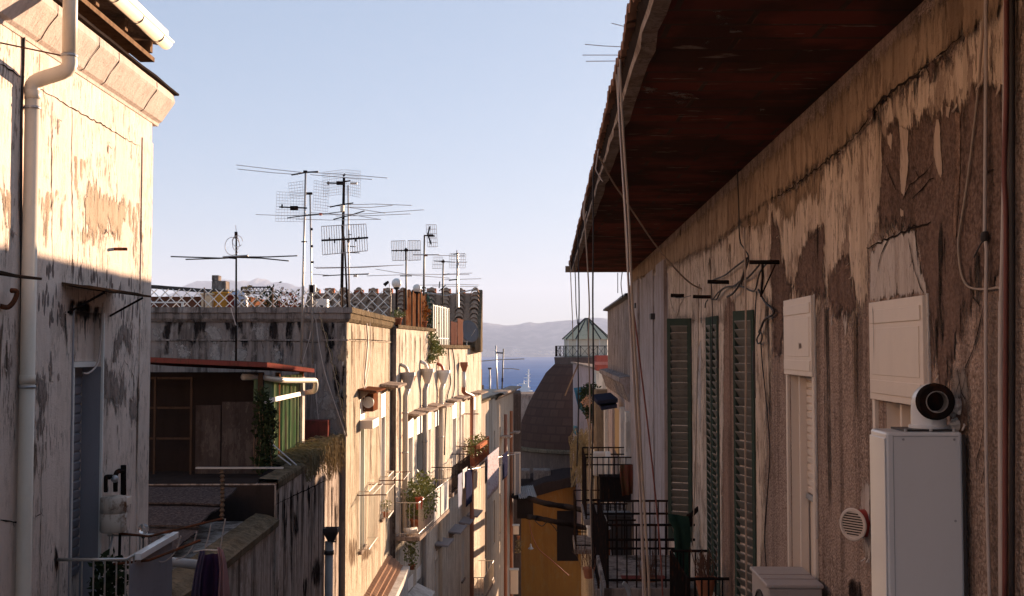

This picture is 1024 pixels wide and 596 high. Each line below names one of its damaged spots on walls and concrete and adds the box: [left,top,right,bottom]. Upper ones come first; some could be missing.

crack [772,35,962,199]
peeling [38,156,140,264]
damp [162,322,301,363]
peeling [741,169,856,356]
peeling [877,73,1002,435]